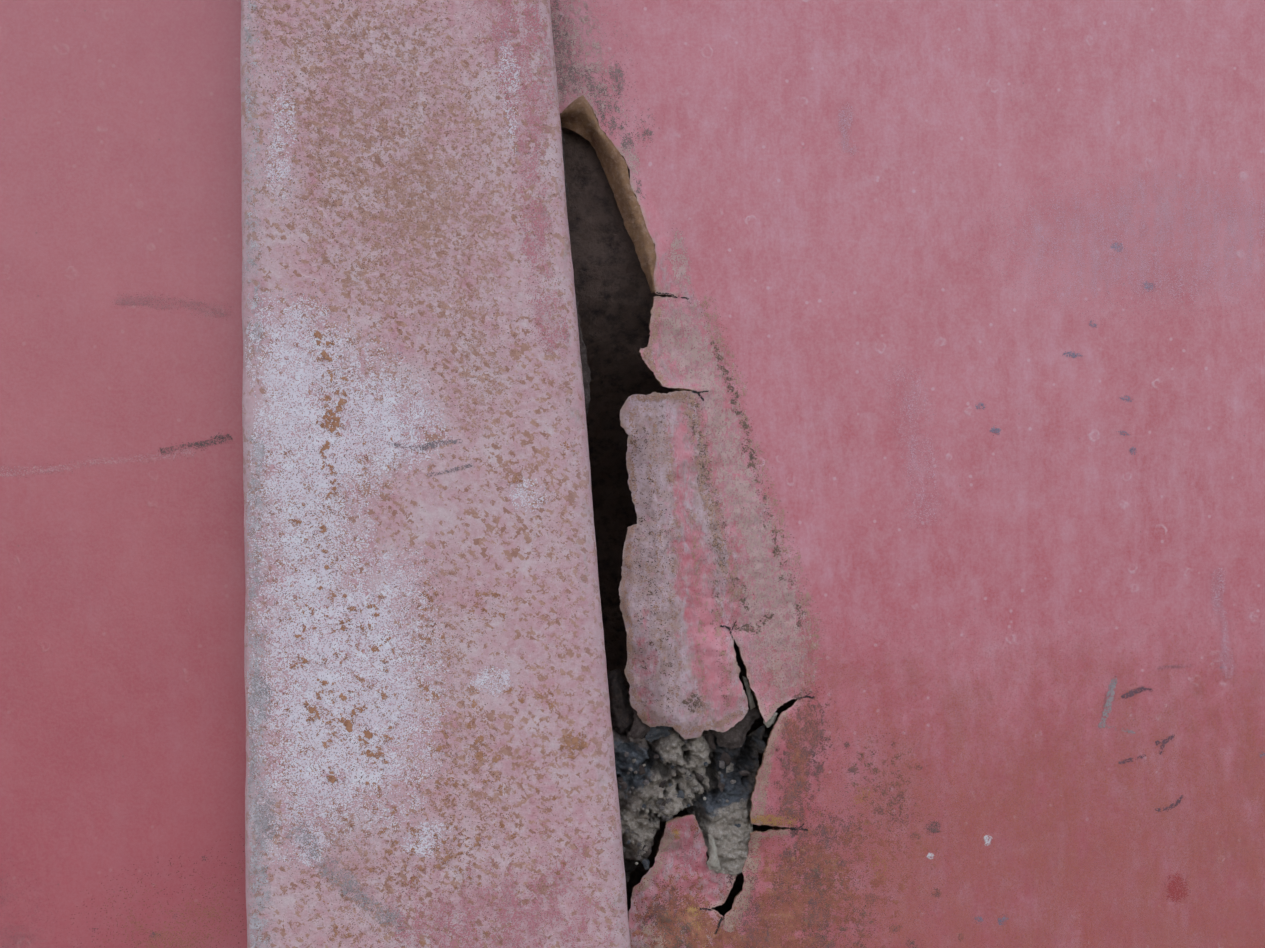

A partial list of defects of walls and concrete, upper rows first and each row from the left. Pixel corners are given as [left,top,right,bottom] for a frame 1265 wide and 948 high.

rust [252,0,570,572]
peeling [649,229,823,709]
rust [621,296,945,948]
rust [275,557,521,948]
rust [497,684,556,710]
rust [559,729,591,760]
peeling [635,829,697,893]
crack [700,908,725,934]
peeling [717,831,788,933]